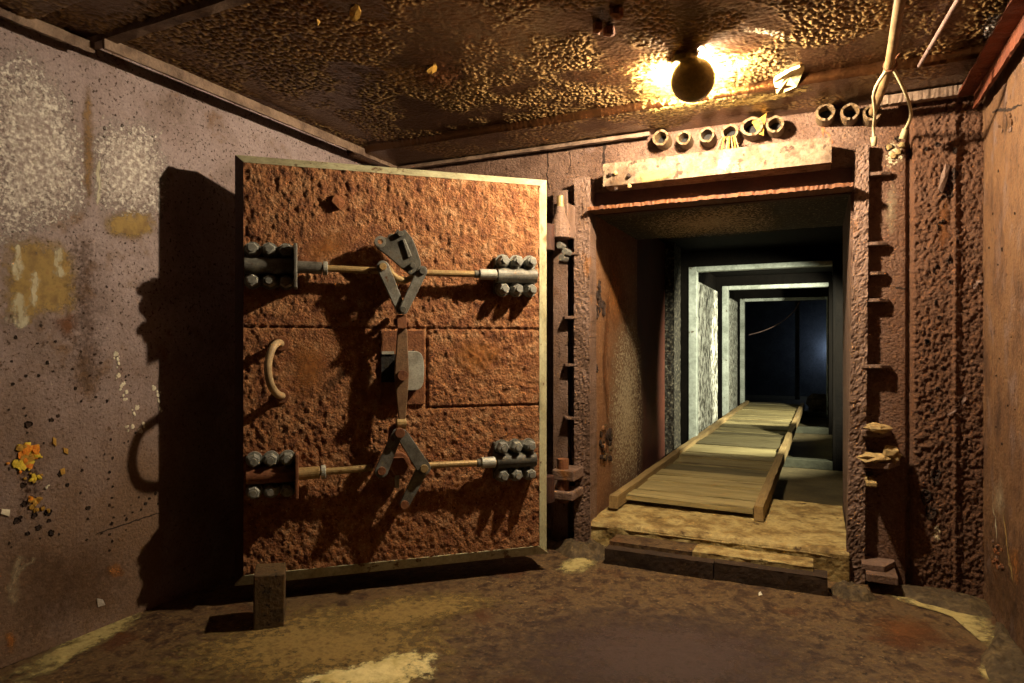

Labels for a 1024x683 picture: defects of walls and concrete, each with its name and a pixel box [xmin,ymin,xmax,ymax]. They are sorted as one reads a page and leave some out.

peeling [0,49,167,250]
rust [332,194,345,210]
peeling [0,407,82,539]